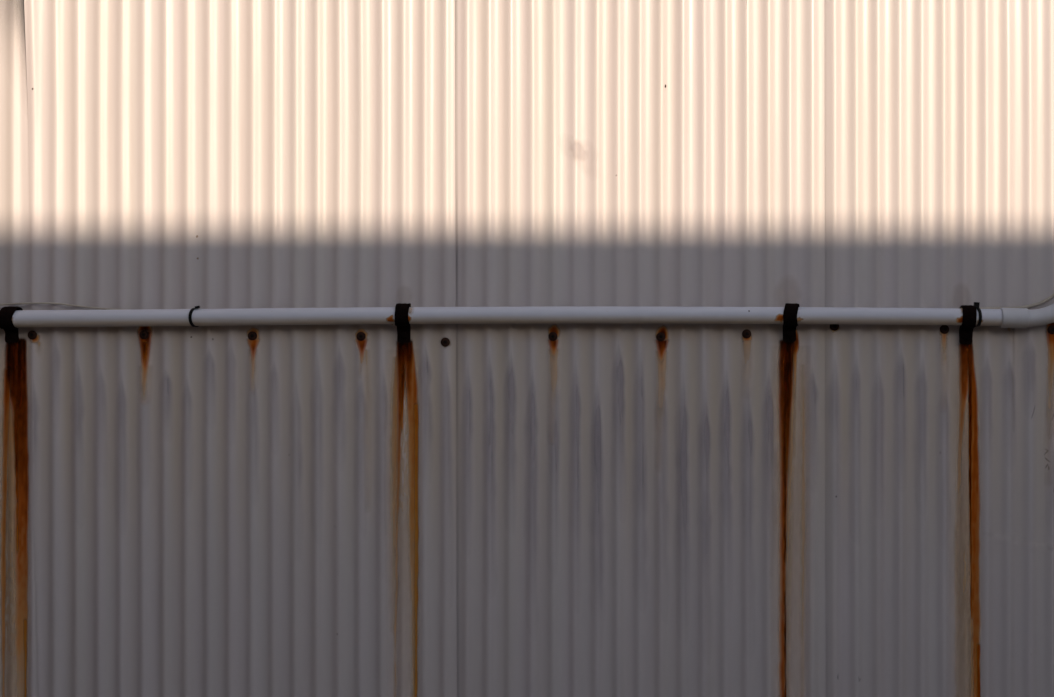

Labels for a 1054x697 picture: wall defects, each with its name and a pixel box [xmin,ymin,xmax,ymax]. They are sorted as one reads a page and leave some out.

corrosion [1,335,39,697]
corrosion [138,326,152,389]
corrosion [392,340,419,697]
corrosion [779,317,804,697]
corrosion [958,344,980,697]
corrosion [1046,322,1054,385]